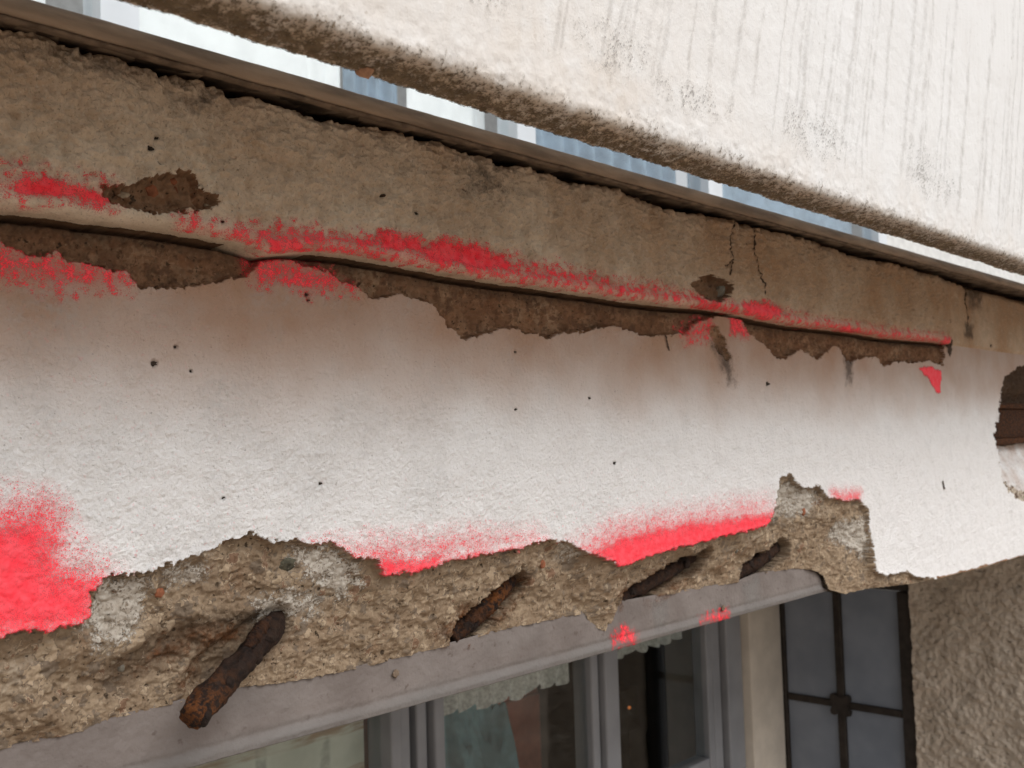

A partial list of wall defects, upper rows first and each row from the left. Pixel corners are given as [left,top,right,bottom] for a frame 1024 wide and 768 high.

flaking render [99,168,221,215]
peeling [0,215,947,367]
crack [725,222,768,299]
spalling [0,473,1024,750]